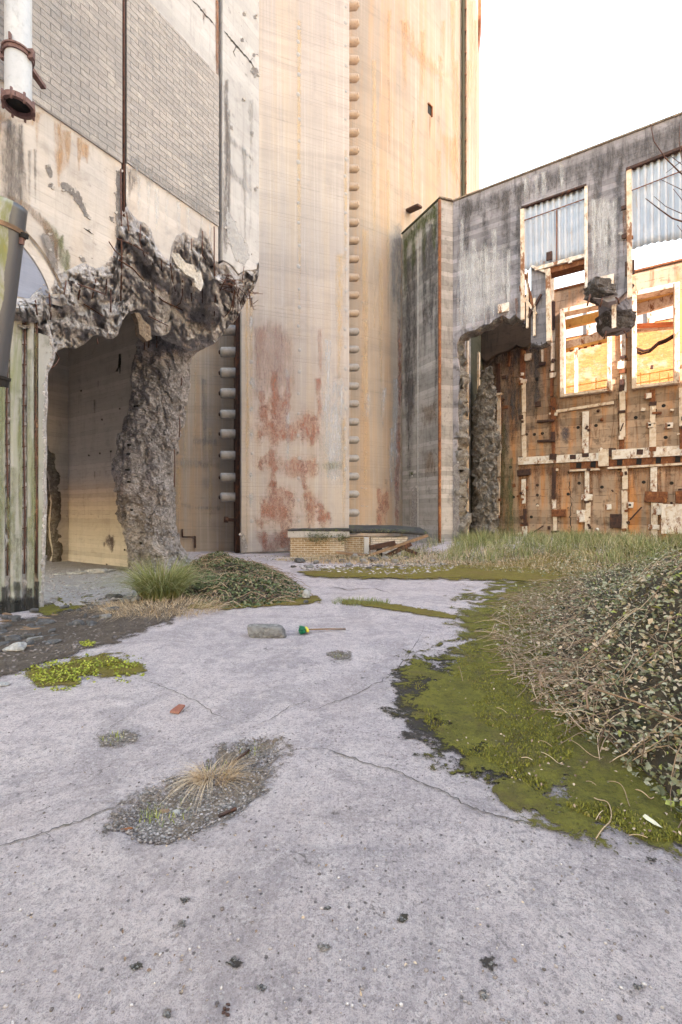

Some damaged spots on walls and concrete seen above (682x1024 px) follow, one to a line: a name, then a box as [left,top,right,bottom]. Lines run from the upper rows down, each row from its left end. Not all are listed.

damp [2,121,63,257]
spalling [5,164,261,607]
rust [258,375,331,550]
damp [380,206,438,481]
spalling [452,315,526,540]
damp [460,127,682,320]
spalling [583,276,637,339]
crack [0,797,132,846]
crack [300,748,603,846]